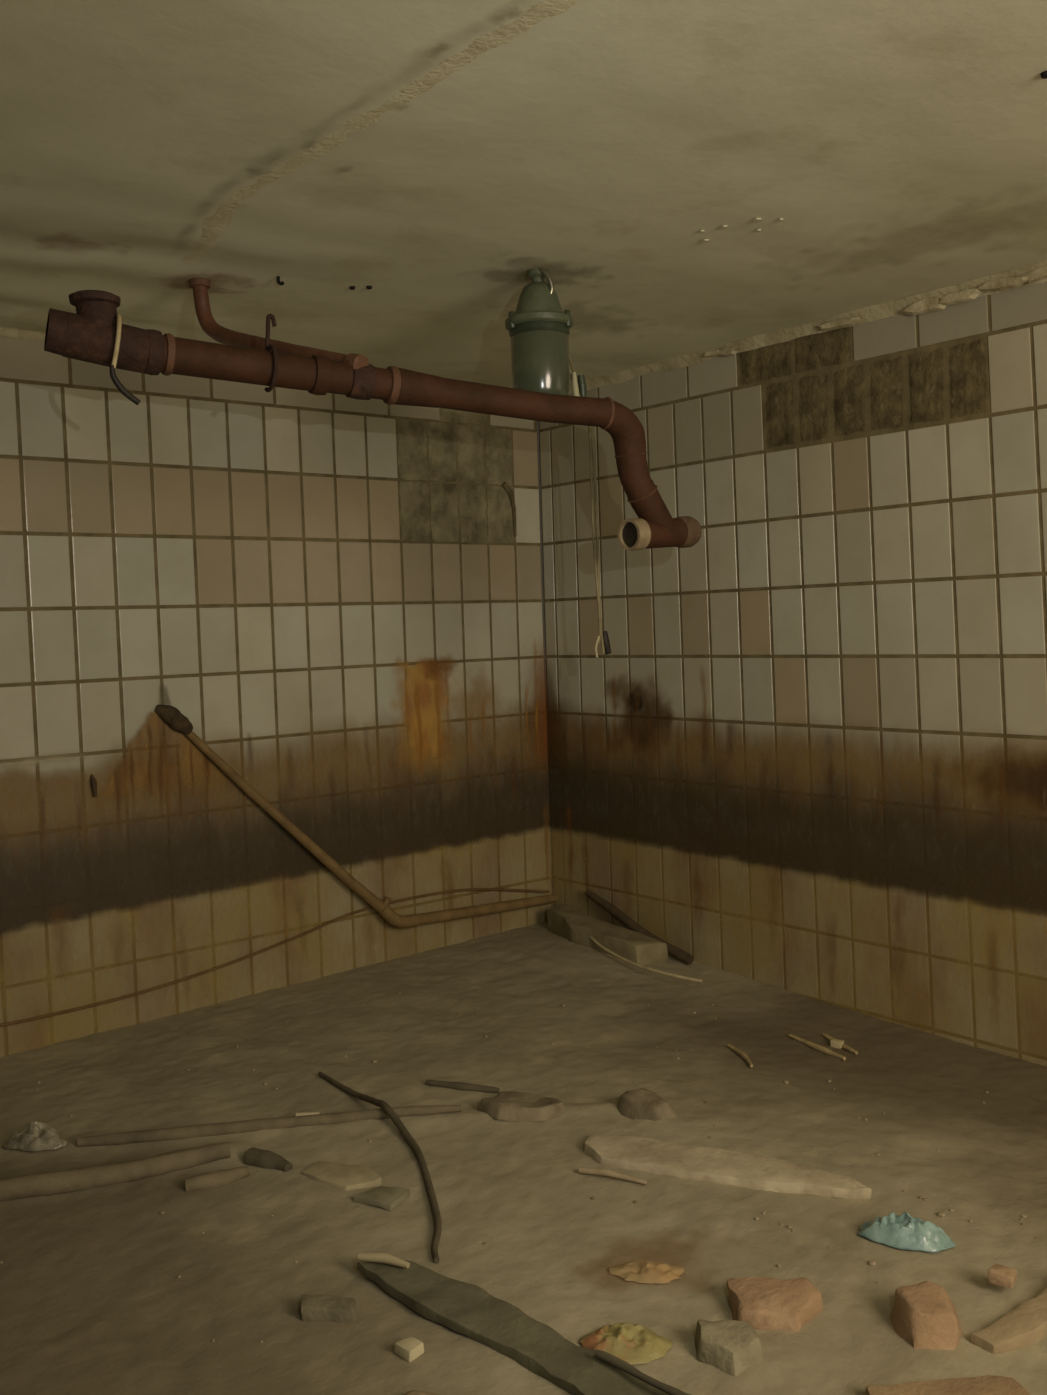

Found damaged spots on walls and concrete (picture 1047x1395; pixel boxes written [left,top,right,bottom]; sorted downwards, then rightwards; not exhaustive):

rust [103,713,222,796]
rust [403,660,449,760]
rust [613,683,672,750]
leakage [0,713,1047,1061]